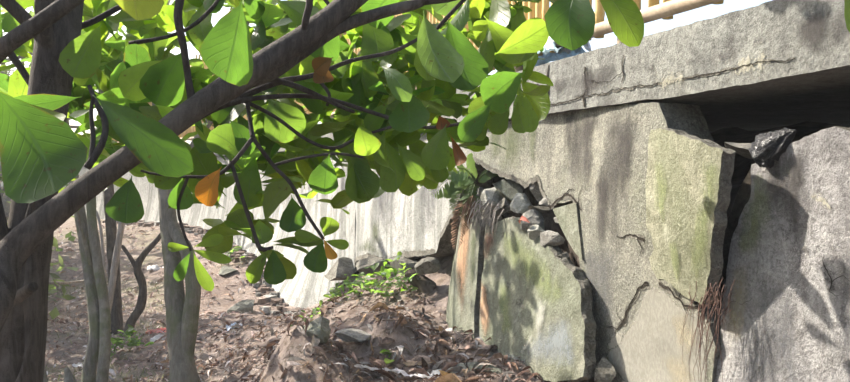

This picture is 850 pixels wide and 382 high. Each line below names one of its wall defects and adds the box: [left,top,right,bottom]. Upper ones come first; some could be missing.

crack [536,55,795,107]
crack [550,187,582,218]
corrosion [457,218,469,287]
crack [607,163,754,336]
corrosion [480,285,489,331]